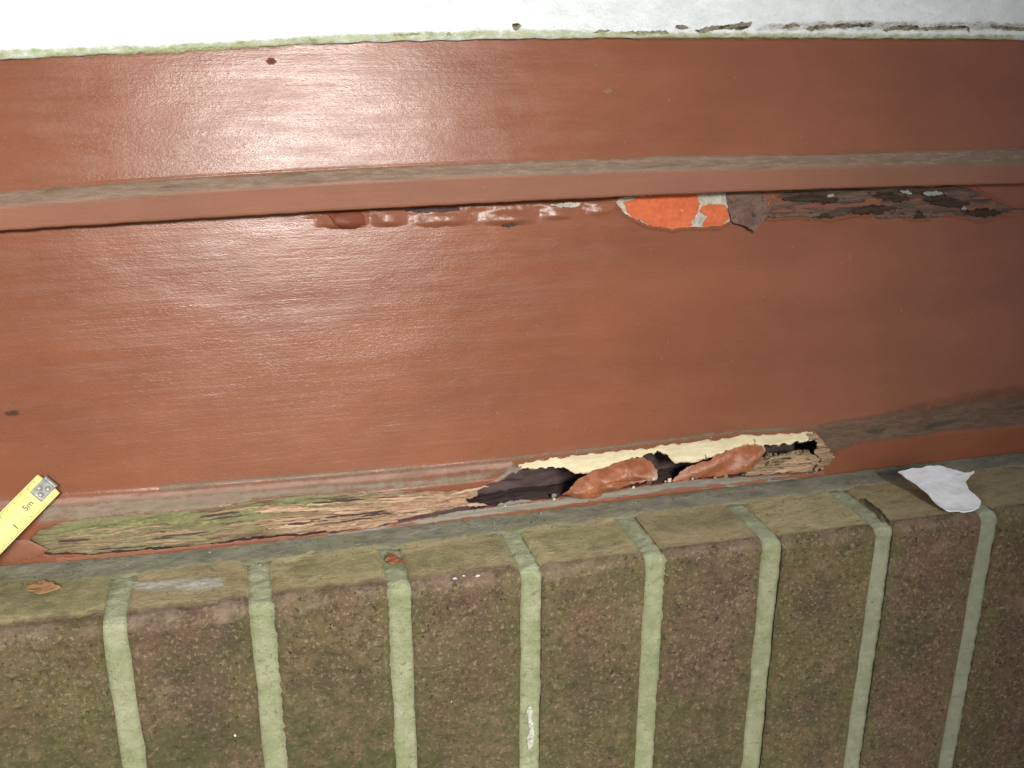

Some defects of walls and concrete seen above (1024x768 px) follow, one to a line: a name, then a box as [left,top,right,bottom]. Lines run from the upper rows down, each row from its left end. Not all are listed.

peeling [612,191,770,234]
peeling [562,457,658,499]
peeling [672,444,766,482]